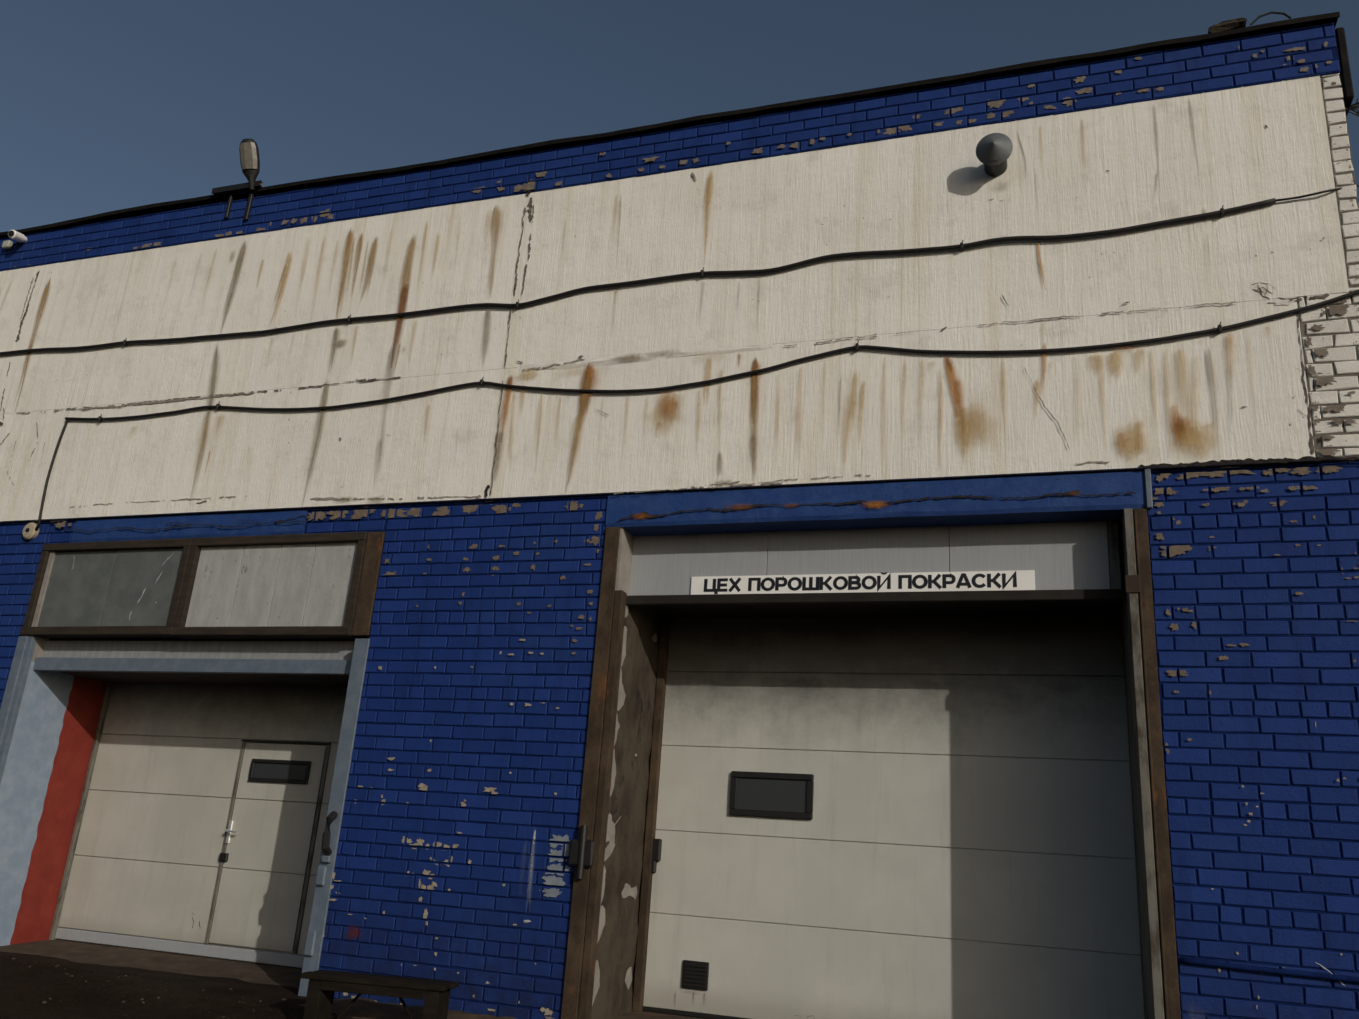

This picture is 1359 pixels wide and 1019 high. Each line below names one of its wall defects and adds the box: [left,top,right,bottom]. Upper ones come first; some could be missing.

peeling [1283,41,1336,85]
peeling [934,76,1093,126]
rust [338,230,377,308]
rust [568,364,594,480]
rust [940,358,965,452]
rust [1175,418,1204,449]
peeling [1153,282,1357,525]
peeling [306,501,521,521]
peeling [564,501,603,566]
peeling [1156,533,1192,557]
peeling [533,830,571,897]
peeling [402,832,471,971]